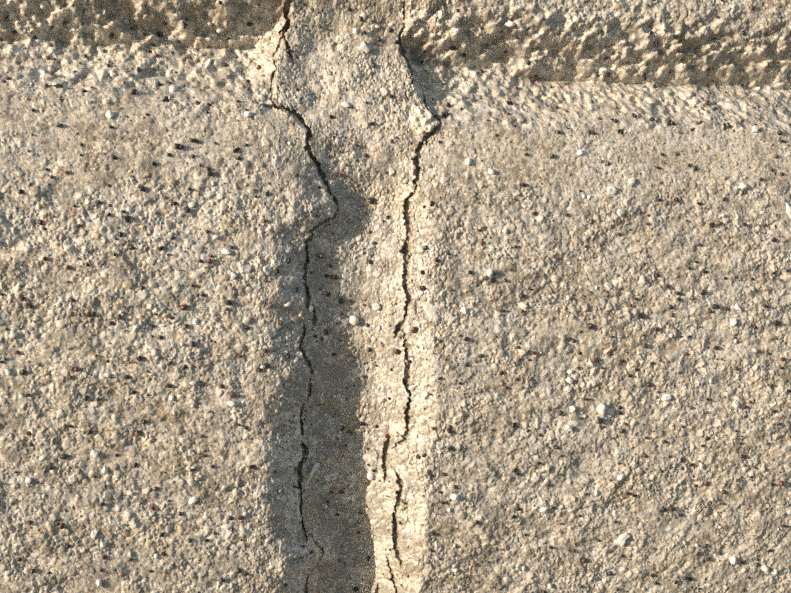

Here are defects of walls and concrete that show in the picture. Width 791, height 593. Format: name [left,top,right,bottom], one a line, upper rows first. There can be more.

crack [253,0,339,593]
crack [375,0,449,593]